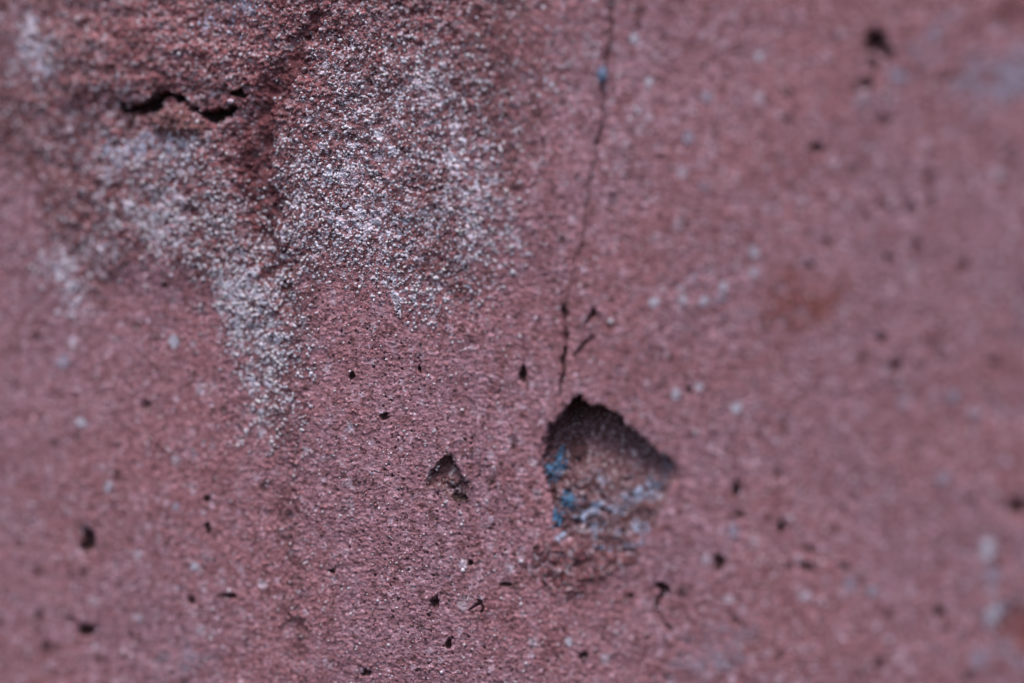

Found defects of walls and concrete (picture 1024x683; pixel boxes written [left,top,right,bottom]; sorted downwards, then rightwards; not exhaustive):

crack [101,23,322,156]
leakage [1,0,653,457]
crack [560,0,614,396]
spalling [426,452,471,502]
spalling [532,393,679,598]